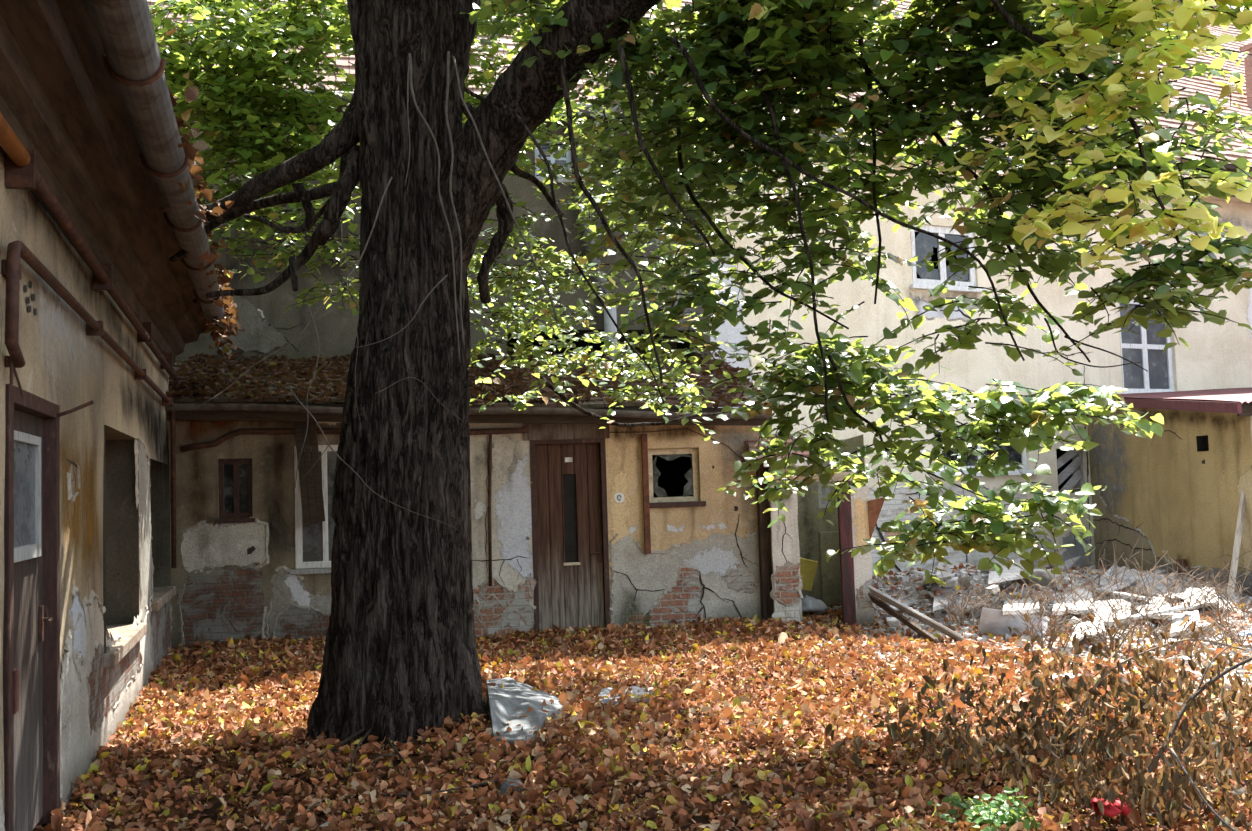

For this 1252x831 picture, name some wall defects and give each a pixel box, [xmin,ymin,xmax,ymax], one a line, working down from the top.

water stain [1092,424,1126,512]
peeling [473,434,541,639]
crack [611,569,665,603]
flaking render [608,468,804,628]
crack [694,571,752,621]
crack [735,514,791,568]